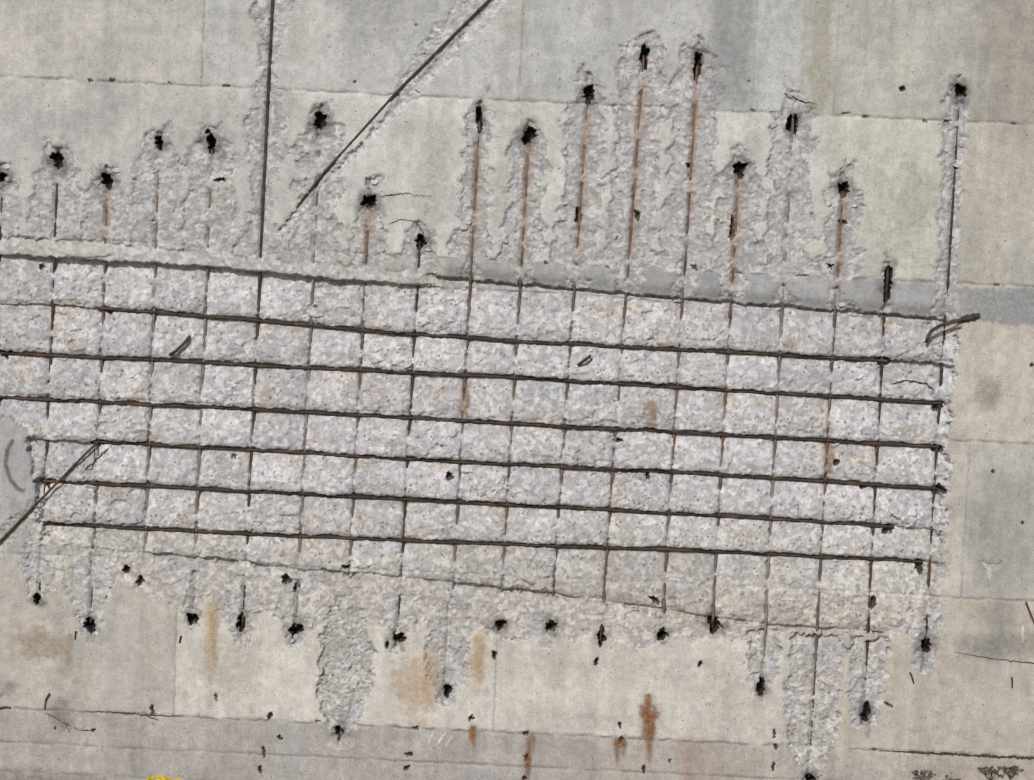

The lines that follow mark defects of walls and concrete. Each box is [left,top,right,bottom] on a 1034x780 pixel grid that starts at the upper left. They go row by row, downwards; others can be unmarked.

spalling [0,396,939,448]
spalling [59,441,937,528]
spalling [43,522,923,563]
rust [640,694,658,752]